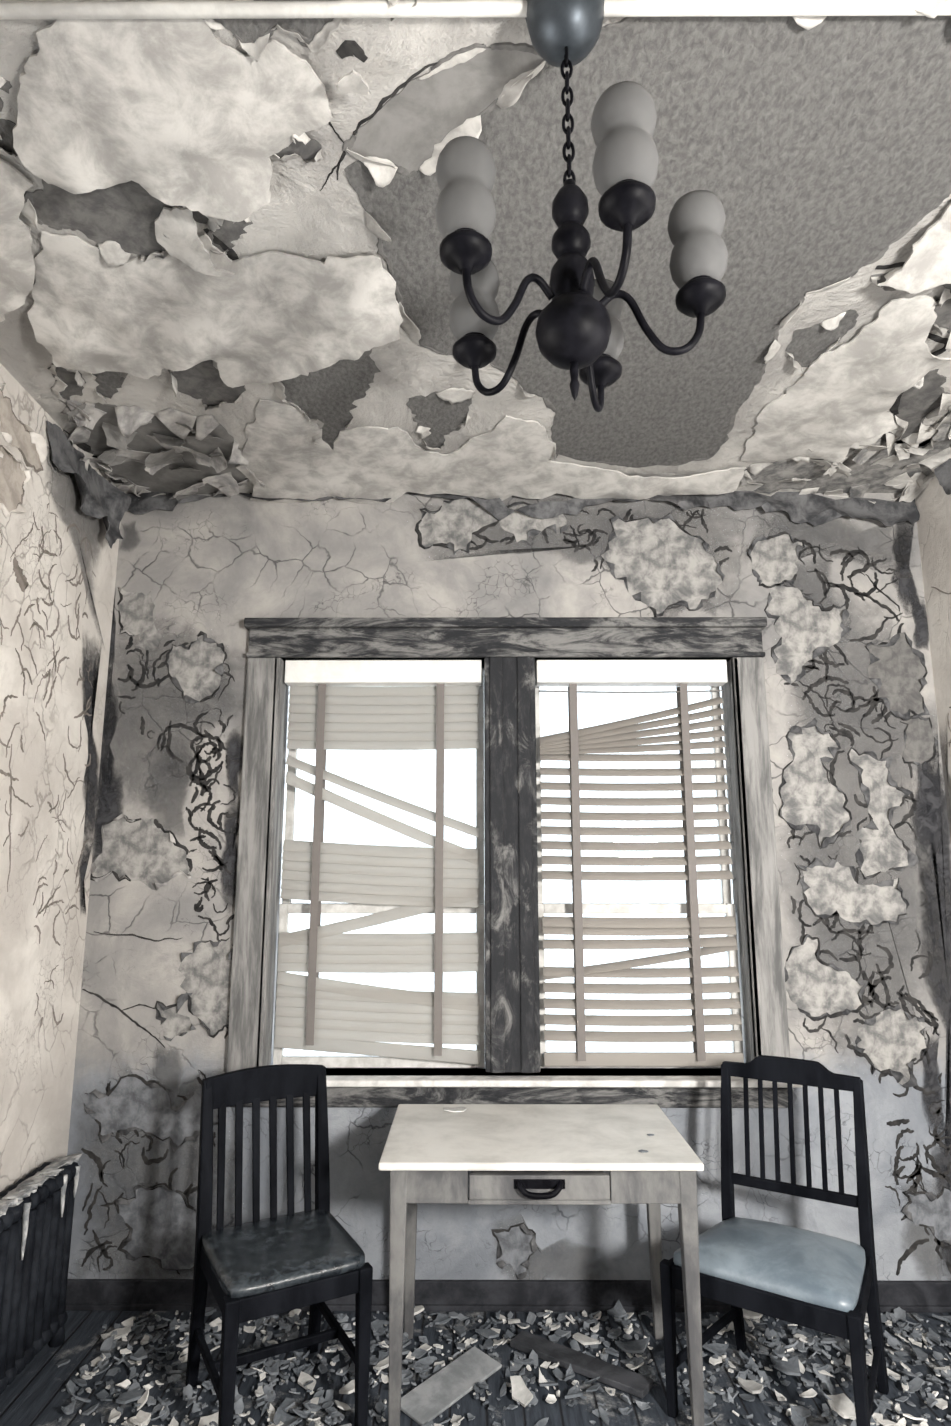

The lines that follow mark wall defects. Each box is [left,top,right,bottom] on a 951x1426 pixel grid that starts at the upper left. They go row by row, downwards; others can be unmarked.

peeling [0,0,951,617]
peeling [117,587,225,703]
peeling [747,531,851,684]
crack [0,503,239,1100]
peeling [90,814,193,891]
peeling [778,632,938,928]
crack [784,538,951,1276]
peeling [155,937,233,1041]
peeling [784,934,927,1088]
peeling [82,1074,218,1154]
crack [81,1130,198,1272]